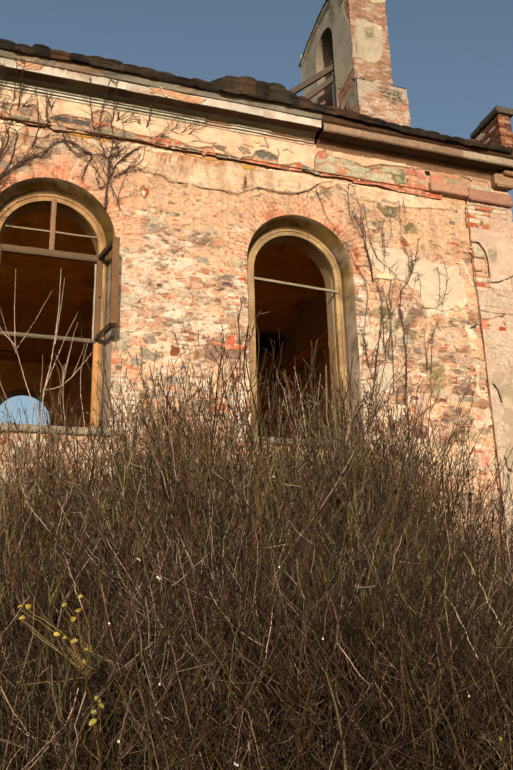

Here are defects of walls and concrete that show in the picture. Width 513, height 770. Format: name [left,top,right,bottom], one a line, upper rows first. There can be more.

flaking render [337,0,384,109]
spalling [150,87,207,104]
spalling [0,102,492,199]
crack [250,169,325,212]
spalling [378,202,399,217]
flaking render [368,205,513,313]
spalling [212,331,286,361]
spalling [464,314,507,351]
flaking render [376,360,395,394]